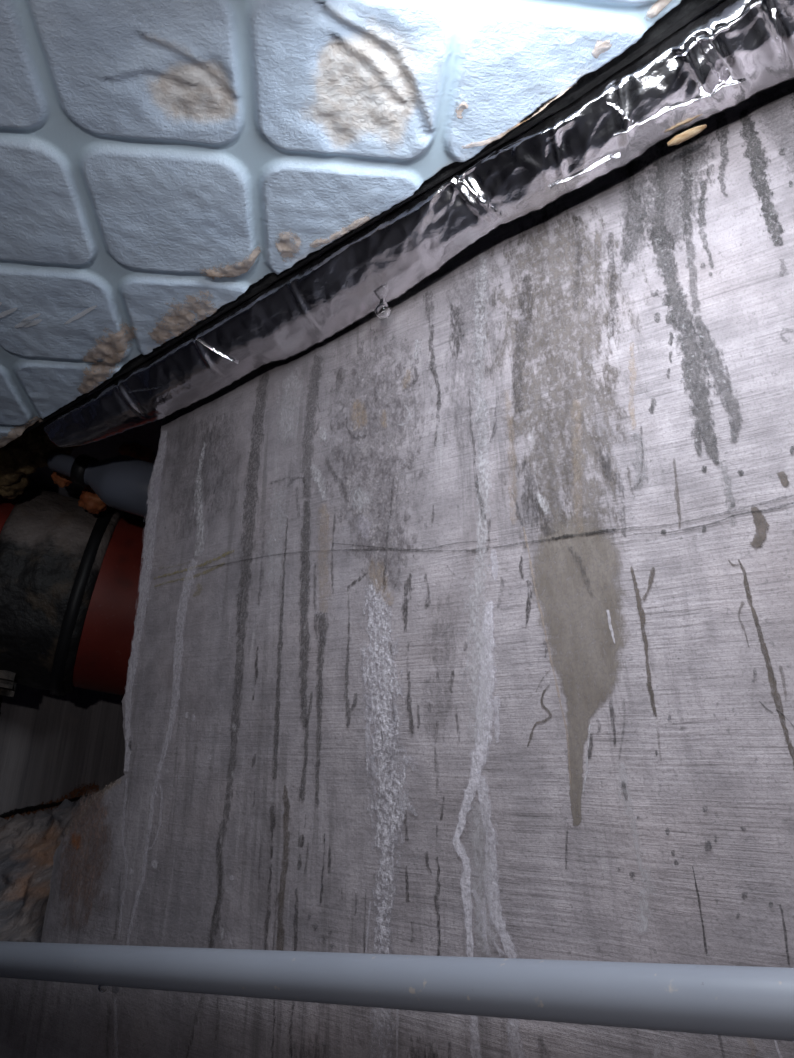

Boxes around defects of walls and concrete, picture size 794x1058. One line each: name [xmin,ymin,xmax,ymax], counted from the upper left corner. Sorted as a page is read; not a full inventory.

leakage [639,110,785,473]
leakage [450,210,657,958]
crack [553,502,794,540]
leakage [344,573,420,954]
spalling [0,792,103,943]
leakage [426,853,441,956]
leakage [469,1015,481,1058]